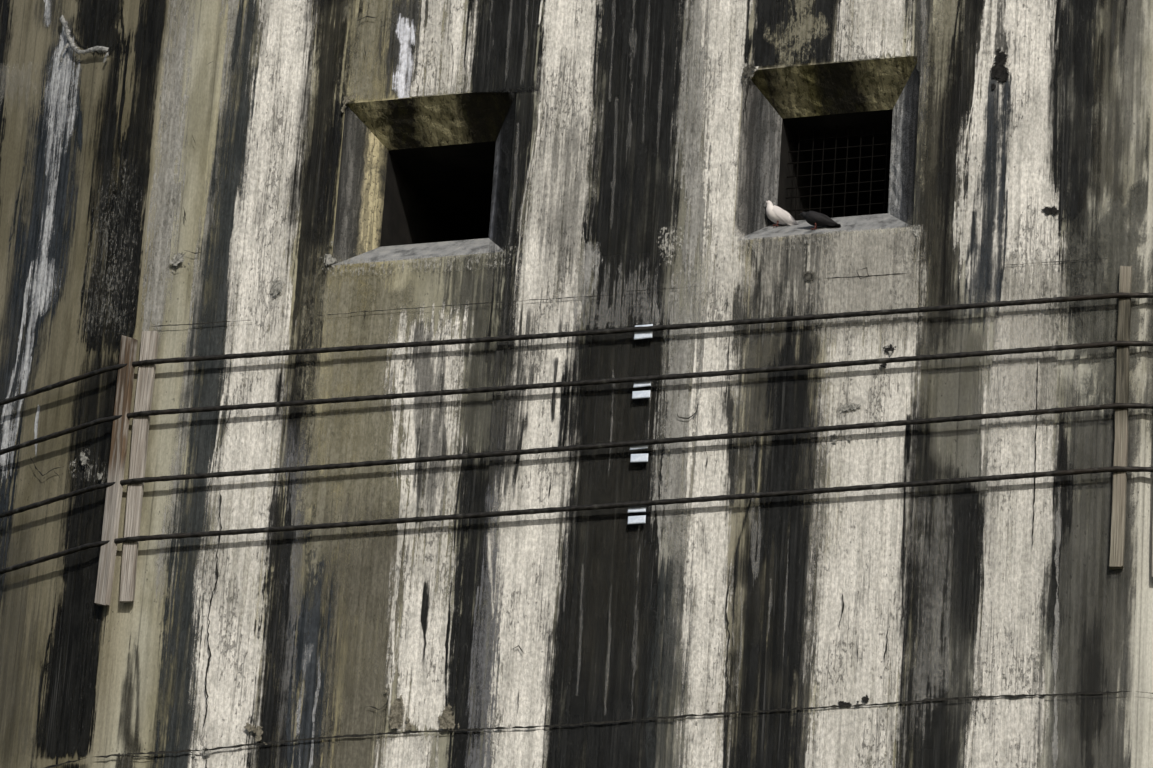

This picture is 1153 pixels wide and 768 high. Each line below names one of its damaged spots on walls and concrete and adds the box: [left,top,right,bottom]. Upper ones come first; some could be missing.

water stain [0,0,194,768]
water stain [150,361,1138,768]
water stain [180,0,1153,476]